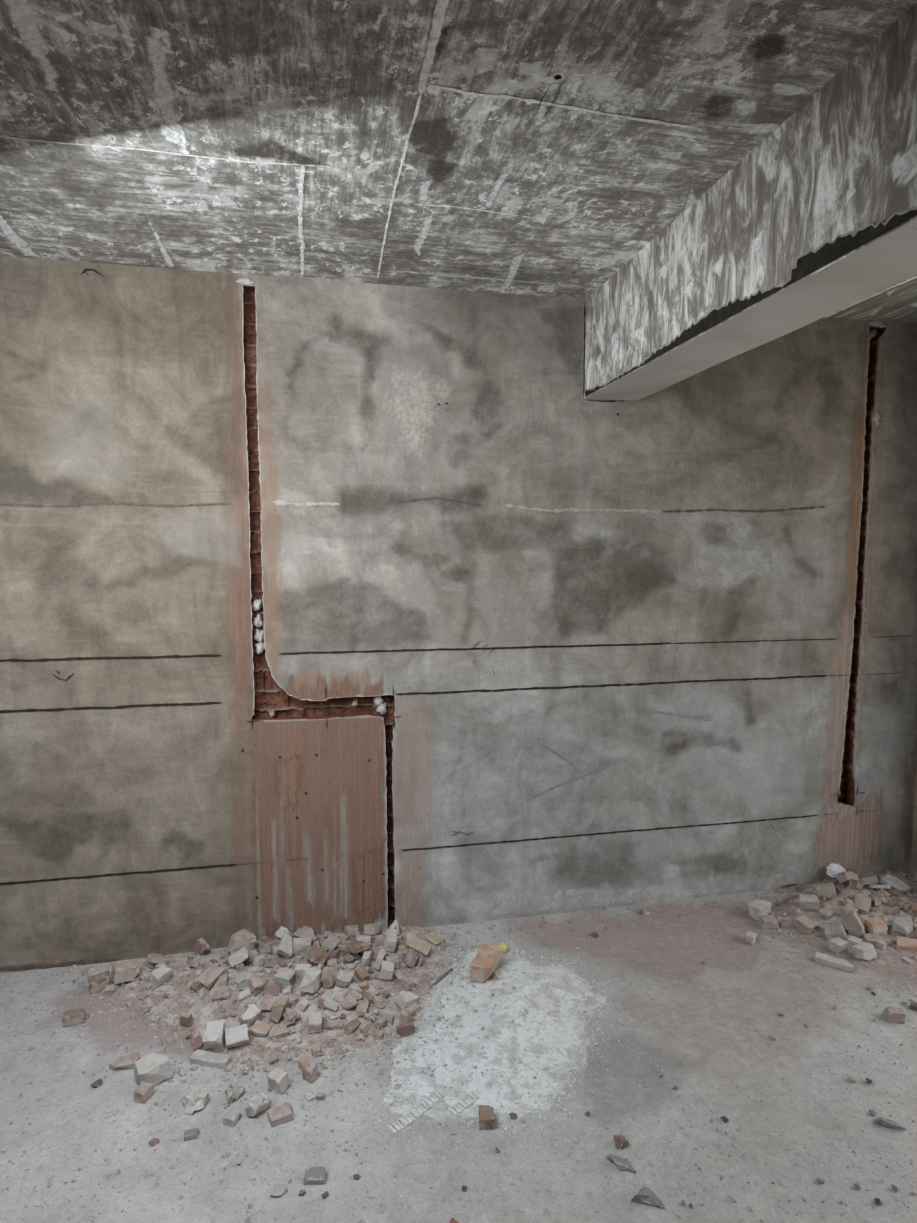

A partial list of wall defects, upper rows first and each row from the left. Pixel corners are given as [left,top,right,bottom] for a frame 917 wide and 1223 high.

peeling [752,36,787,60]
peeling [602,71,645,113]
peeling [773,83,811,96]
peeling [691,96,779,134]
peeling [892,144,917,184]
flaking render [585,207,917,397]